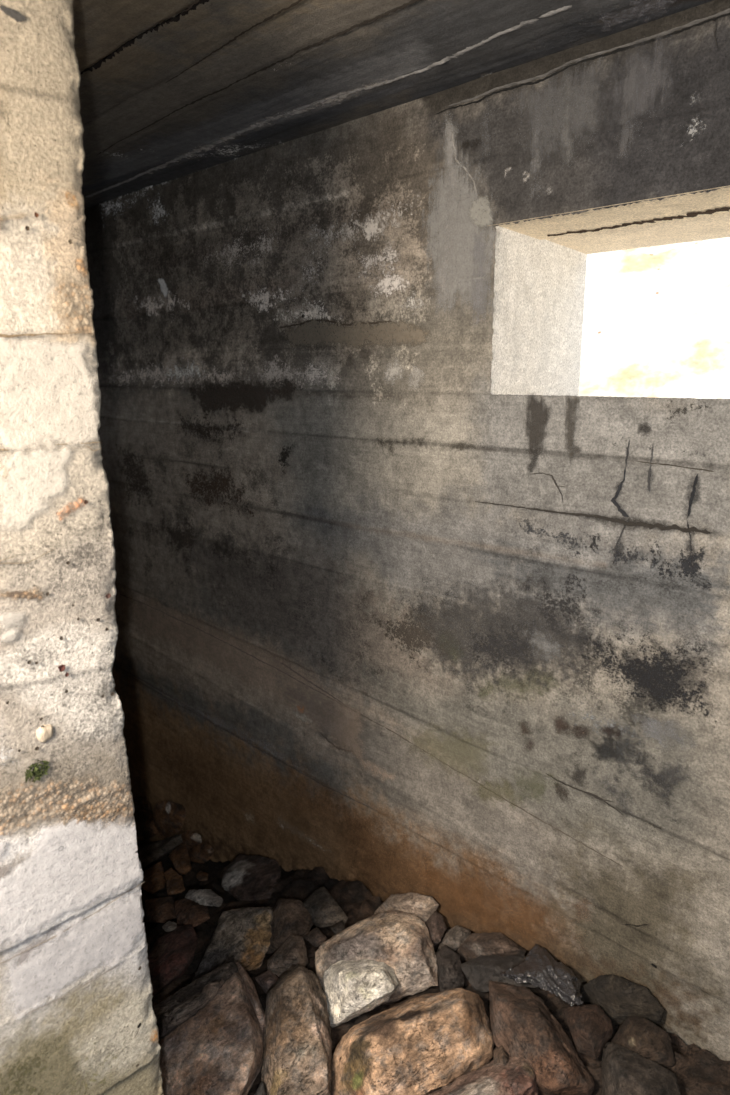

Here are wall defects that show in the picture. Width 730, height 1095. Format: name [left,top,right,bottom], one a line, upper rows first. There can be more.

crack [80,0,419,155]
leakage [519,57,602,191]
crack [436,8,730,114]
leakage [100,183,168,226]
leakage [241,119,496,327]
leakage [135,291,190,323]
leakage [111,354,342,445]
leakage [385,363,424,388]
leakage [526,395,549,472]
leakage [565,398,580,458]
crack [475,440,714,563]
leakage [366,568,720,804]